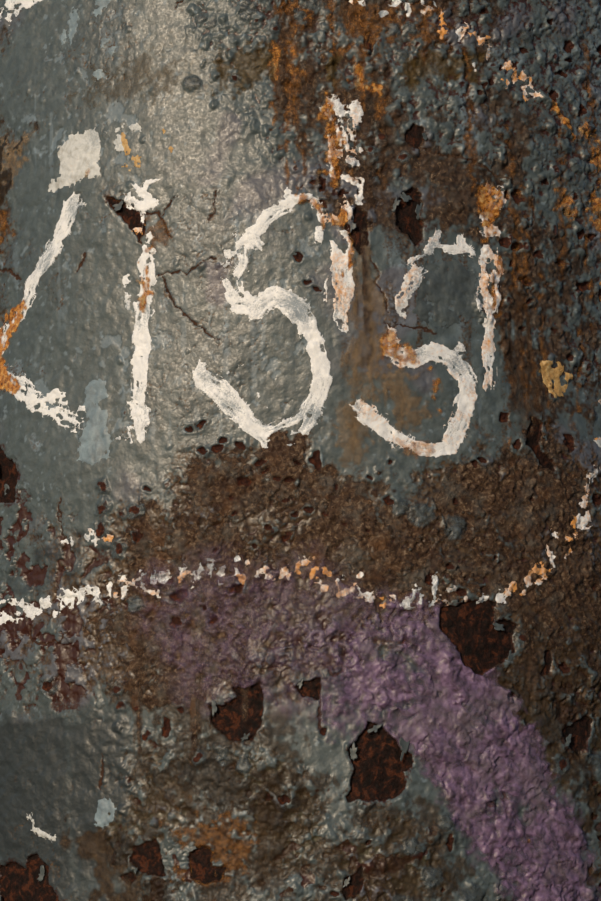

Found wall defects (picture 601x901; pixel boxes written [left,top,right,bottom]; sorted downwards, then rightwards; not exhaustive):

rust [0,135,28,253]
crack [158,256,220,340]
rust [0,300,27,395]
rust [83,0,601,762]
spalling [439,589,518,675]
spalling [209,682,264,741]
spalling [346,722,413,802]
spalling [0,854,59,901]